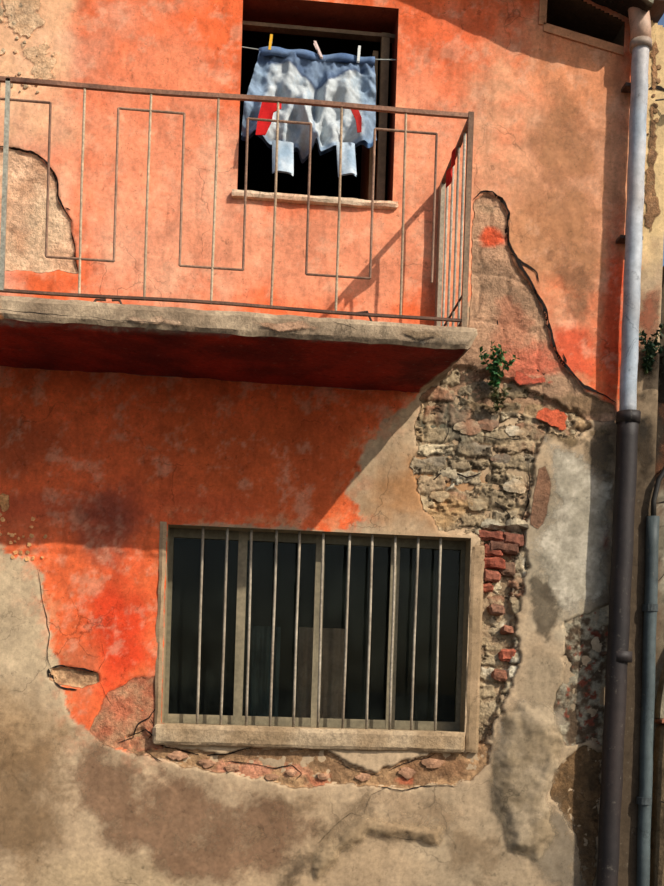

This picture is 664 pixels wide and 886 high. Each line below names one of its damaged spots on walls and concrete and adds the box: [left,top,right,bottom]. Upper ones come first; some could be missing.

peeling [0,0,57,94]
flaking render [0,149,78,274]
crack [474,190,616,403]
peeling [0,494,47,561]
flaking render [90,193,616,886]
crack [38,573,53,667]
damp [530,577,560,640]
damp [0,733,57,854]
damp [76,743,333,886]